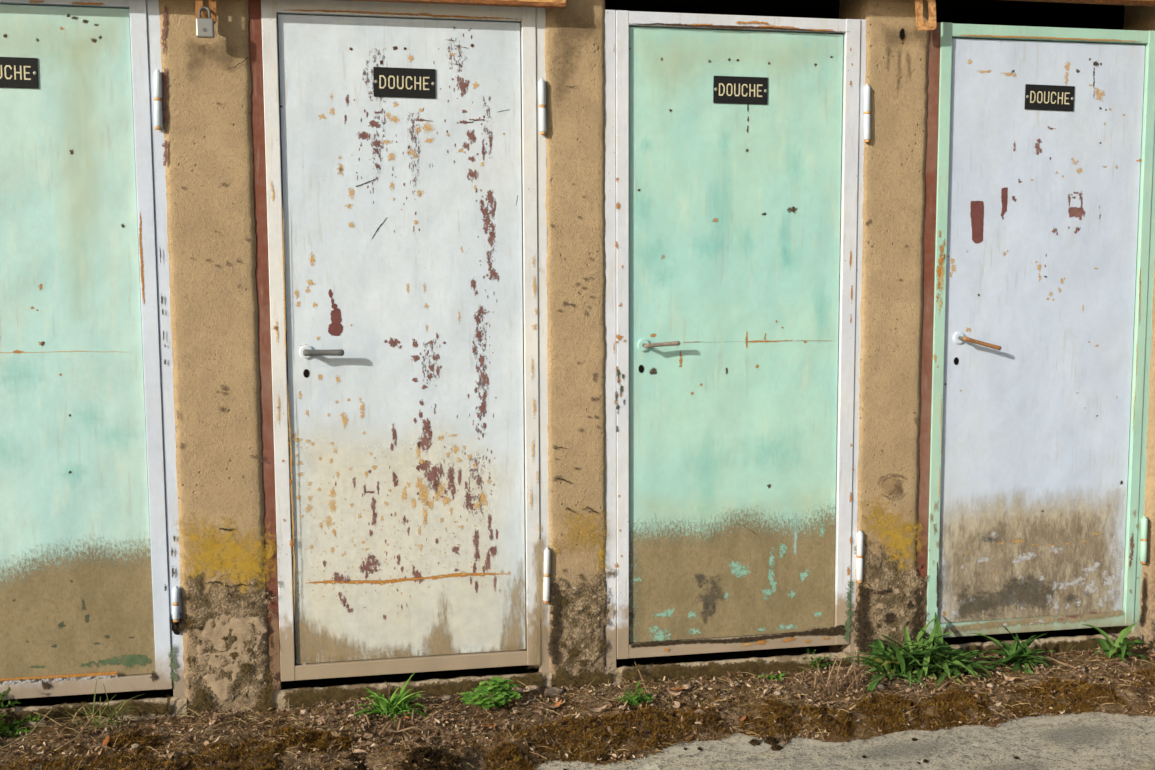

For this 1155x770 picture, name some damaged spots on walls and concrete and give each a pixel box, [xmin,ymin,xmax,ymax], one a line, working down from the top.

rust [284,0,567,20]
rust [271,182,317,359]
rust [277,390,510,611]
leakage [547,583,587,666]
peeling [648,608,674,642]
leakage [695,574,723,623]
peeling [728,561,750,577]
leakage [630,584,895,653]
peeling [762,543,809,599]
leakage [902,563,939,647]
leakage [959,576,1047,617]